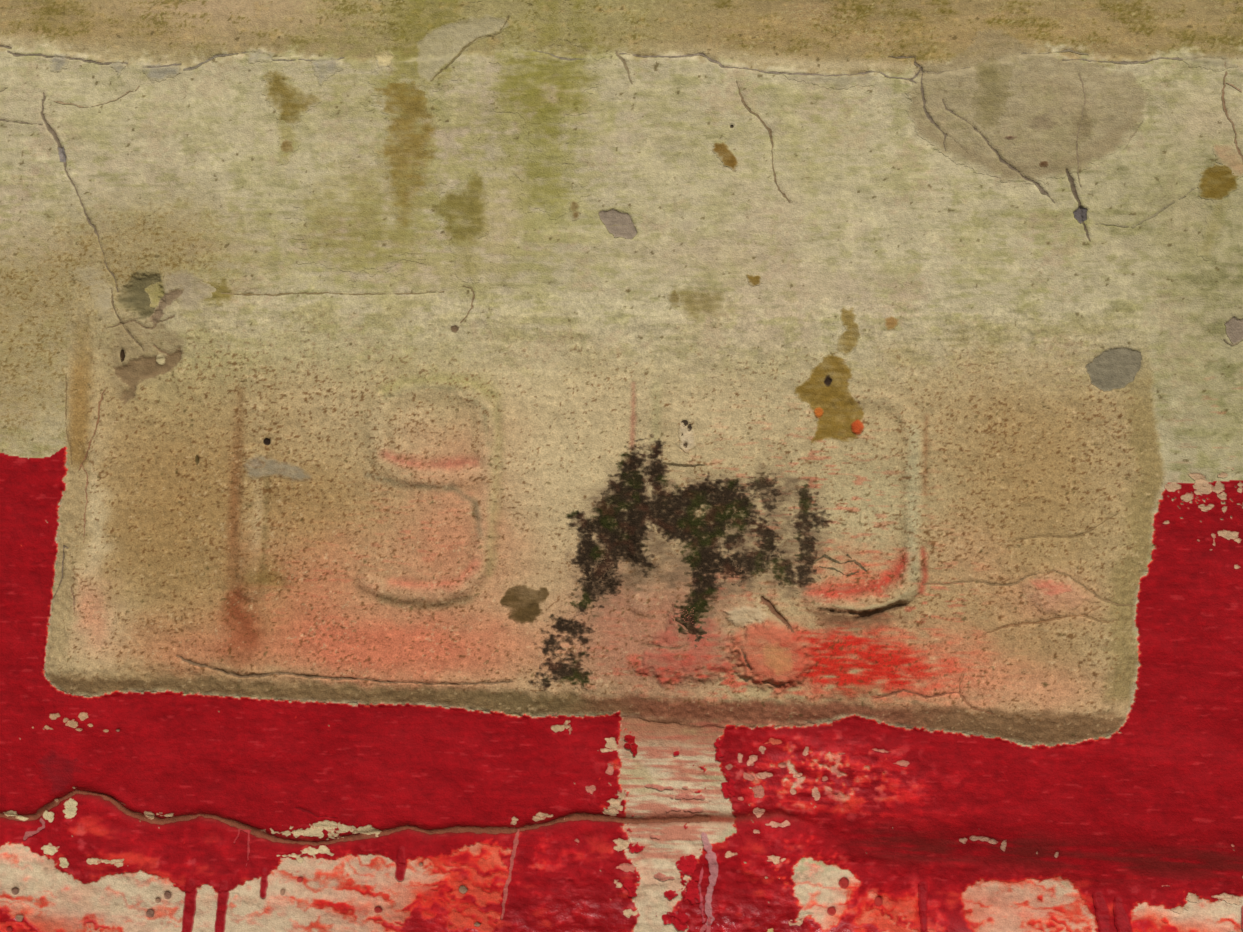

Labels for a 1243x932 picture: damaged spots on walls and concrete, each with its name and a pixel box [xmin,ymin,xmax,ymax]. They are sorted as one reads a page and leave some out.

crack [0,45,344,292]
damp [261,67,322,165]
damp [283,80,490,288]
crack [615,49,1243,241]
damp [905,27,1151,184]
spalling [67,262,216,411]
damp [528,433,867,694]
peeling [3,787,78,823]
peeling [260,820,382,863]
crack [0,790,711,846]
peeling [654,854,701,931]
peeling [714,738,828,834]